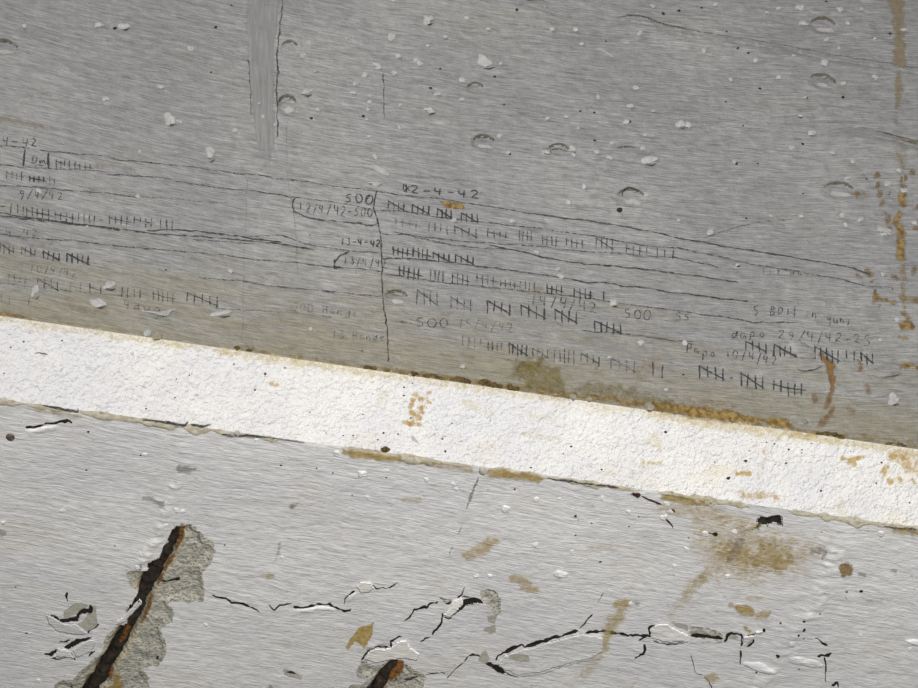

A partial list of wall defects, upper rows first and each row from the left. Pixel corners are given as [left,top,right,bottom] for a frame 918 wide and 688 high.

rust [874,170,918,279]
rust [856,269,918,340]
spalling [45,524,216,688]
crack [212,583,397,615]
spalling [348,639,426,688]
crack [361,587,483,660]
crack [426,593,655,678]
crack [798,621,839,688]